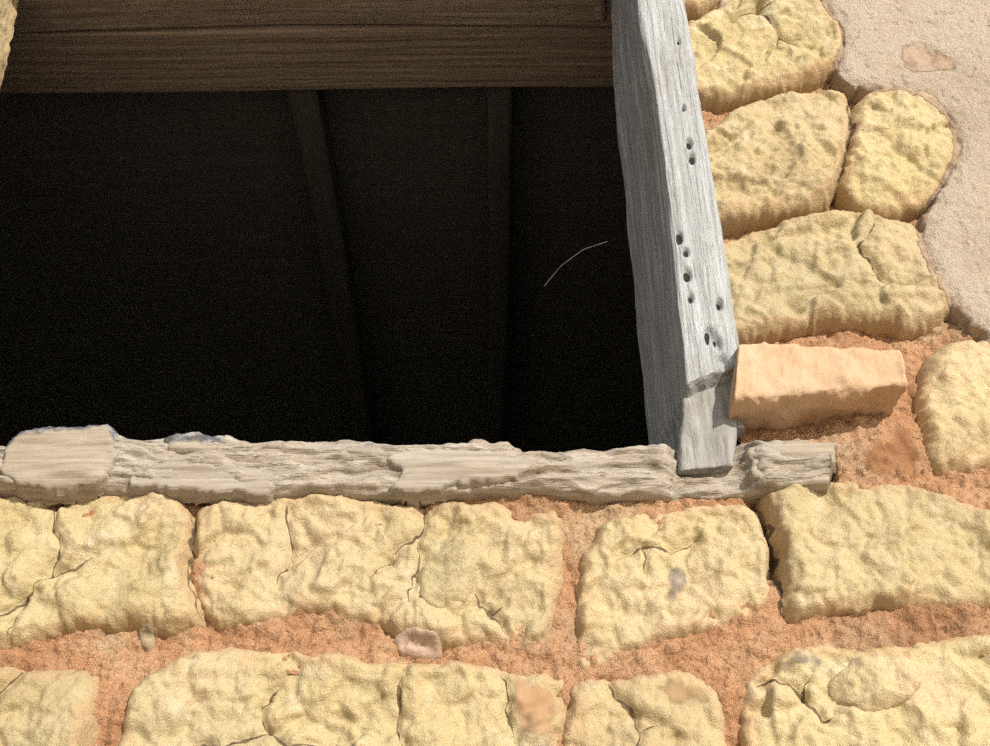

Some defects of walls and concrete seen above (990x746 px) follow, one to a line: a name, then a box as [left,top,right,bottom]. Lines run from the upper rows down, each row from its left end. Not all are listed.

crack [740,0,800,54]
crack [858,223,886,284]
crack [0,504,93,632]
crack [277,506,294,583]
crack [371,506,426,606]
crack [475,594,503,629]
crack [201,692,314,746]
crack [396,670,404,746]
crack [609,685,657,746]
crack [757,676,835,723]